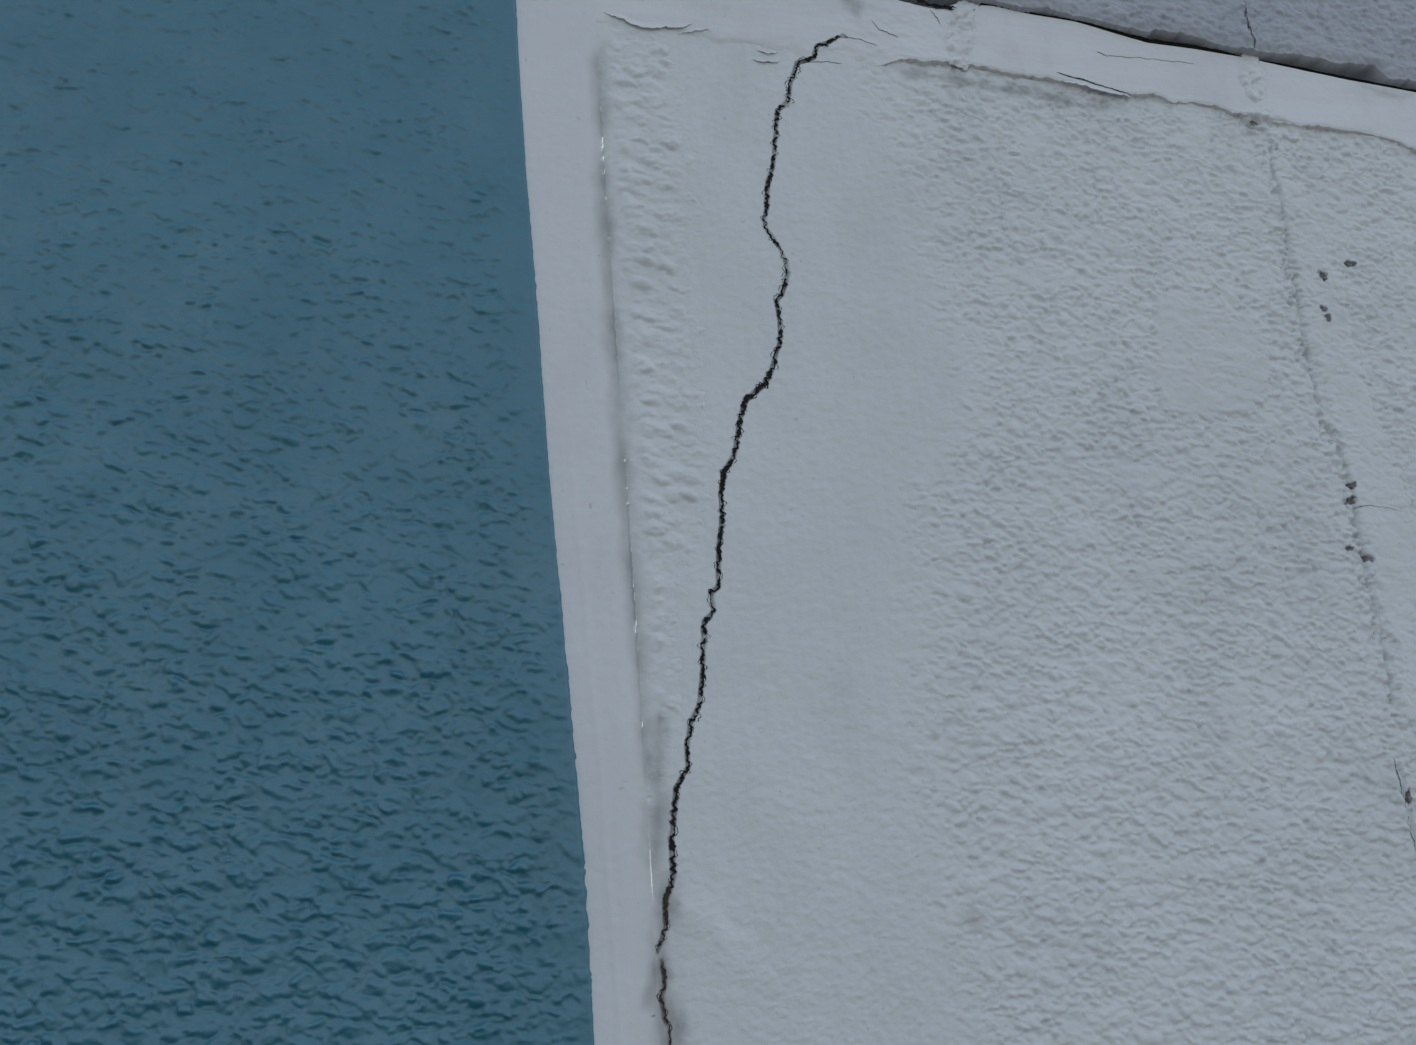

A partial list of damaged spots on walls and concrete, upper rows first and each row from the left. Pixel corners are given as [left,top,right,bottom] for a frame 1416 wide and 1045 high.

crack [917,0,975,23]
crack [652,21,897,1045]